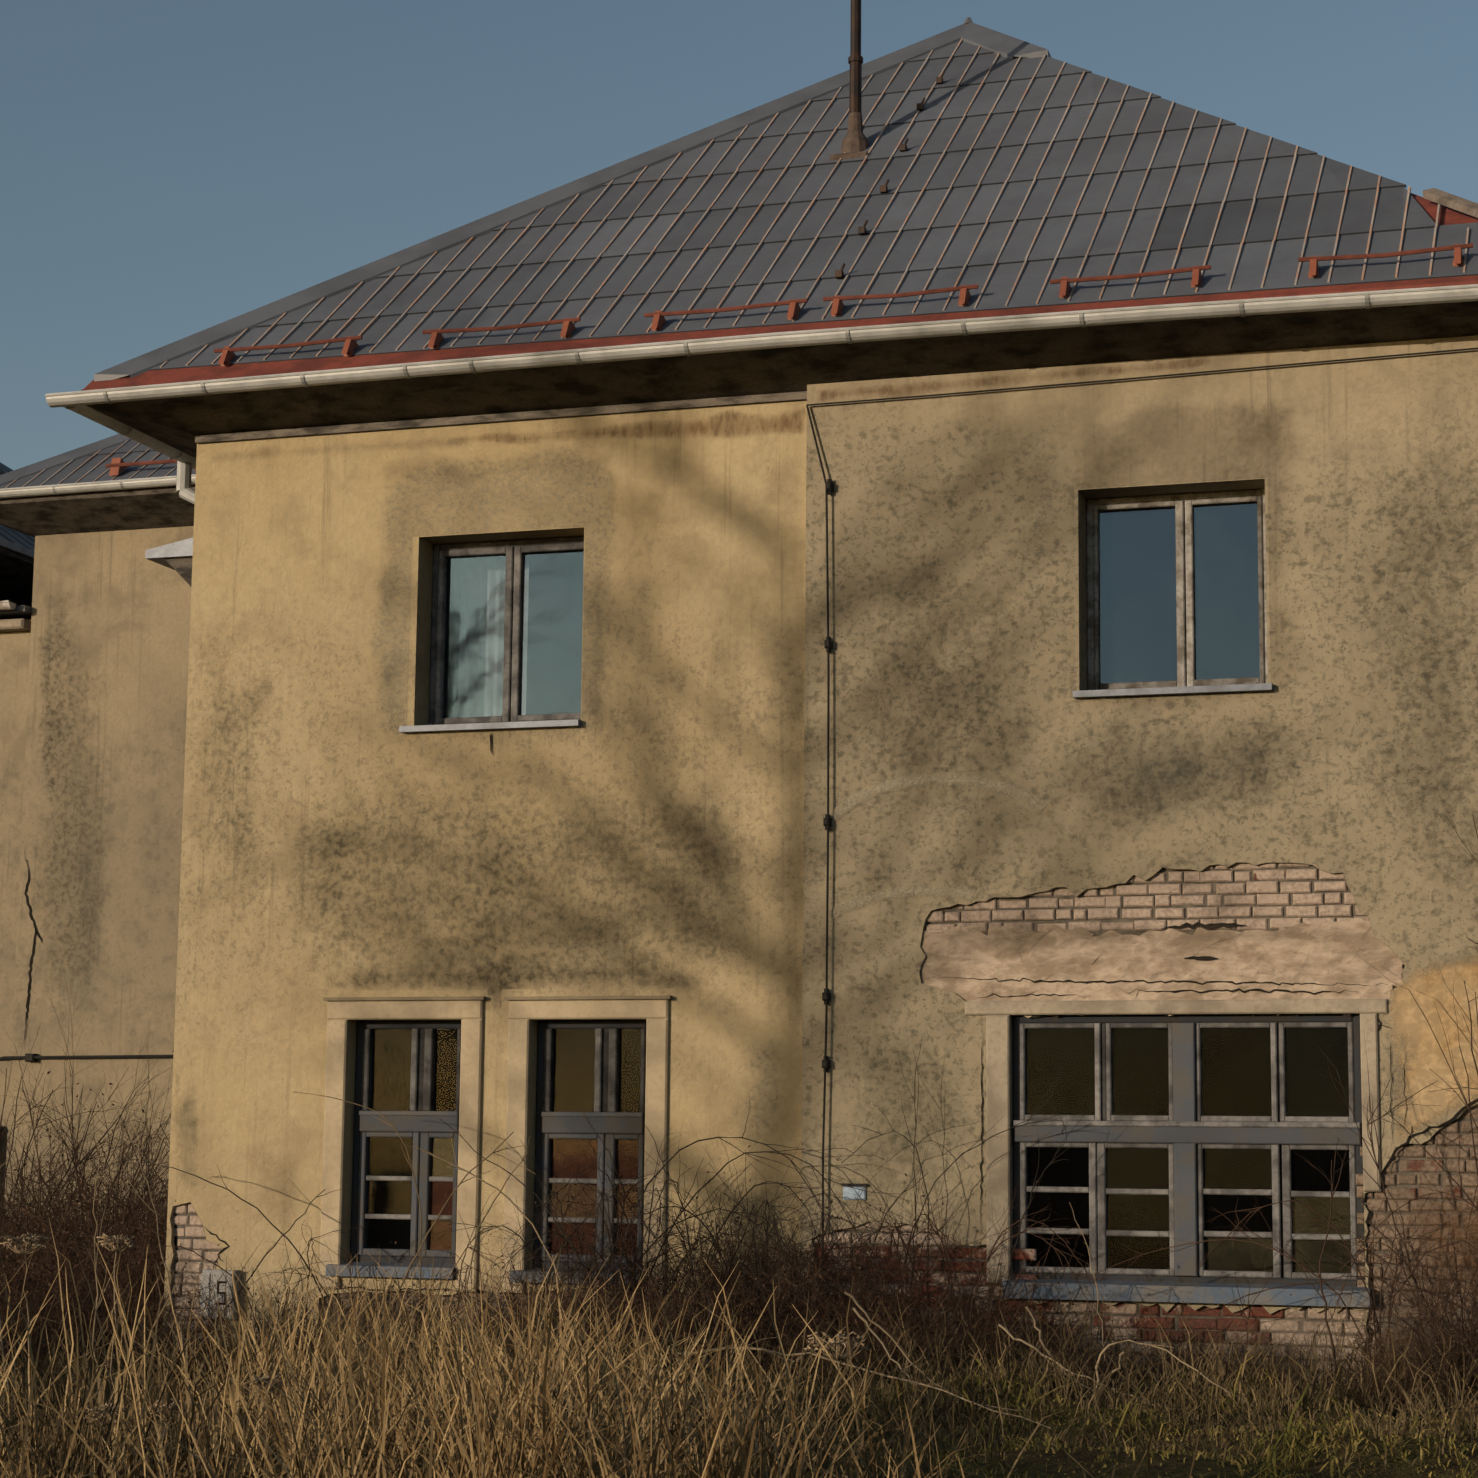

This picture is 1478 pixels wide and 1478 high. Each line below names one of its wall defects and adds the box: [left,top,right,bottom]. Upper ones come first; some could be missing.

crack [24,850,42,1043]
spalling [799,862,1478,1387]
spalling [167,1202,222,1346]